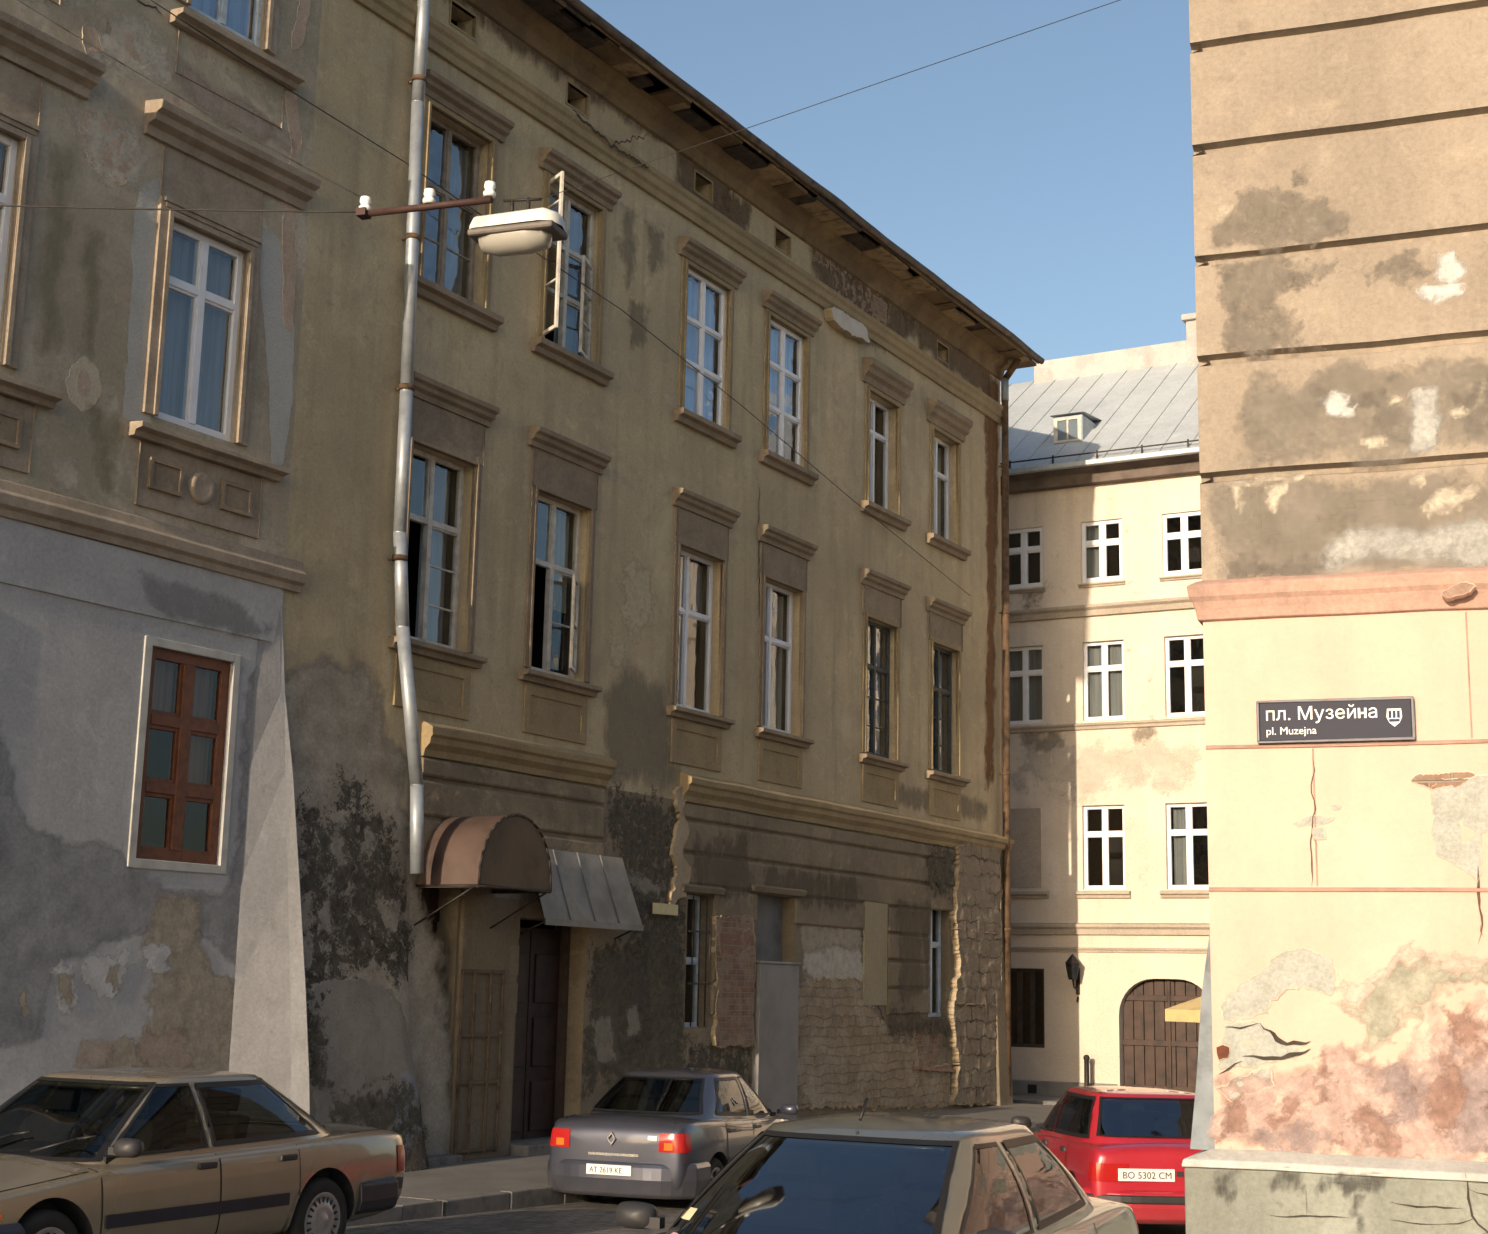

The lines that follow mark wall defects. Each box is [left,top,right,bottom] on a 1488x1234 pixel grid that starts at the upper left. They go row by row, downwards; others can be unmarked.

damp [1325,390,1355,416]
damp [1361,437,1384,448]
damp [1391,386,1485,453]
damp [1229,475,1488,578]
crack [1309,757,1317,881]
peeling [1411,771,1488,883]
peeling [51,895,234,1071]
damp [296,764,429,1172]
damp [581,781,752,1100]
flaking render [1209,947,1488,1161]